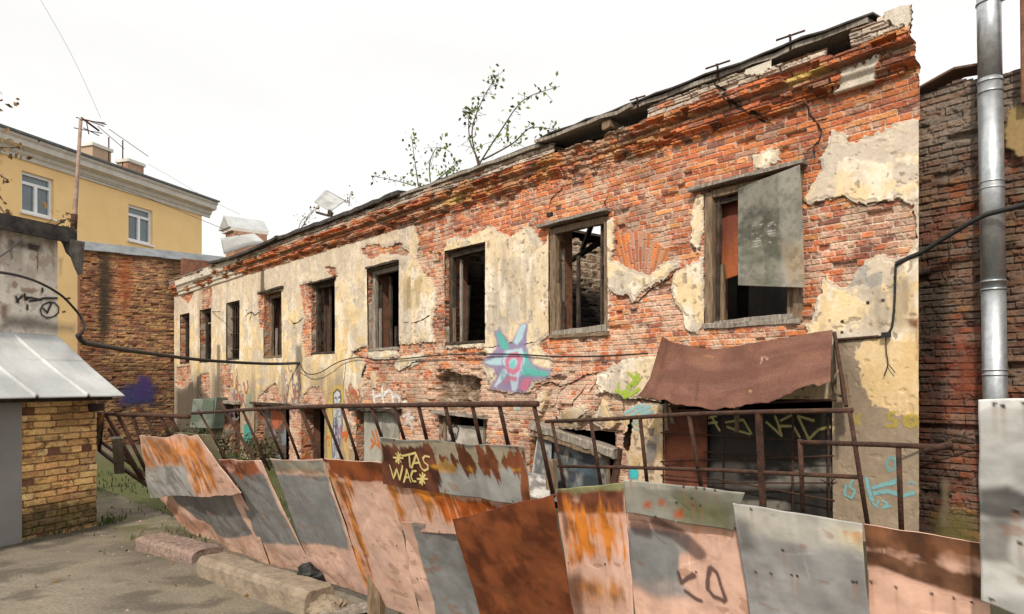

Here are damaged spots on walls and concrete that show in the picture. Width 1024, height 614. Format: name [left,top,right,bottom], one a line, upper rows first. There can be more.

crack [712,80,772,124]
crack [803,96,828,162]
spalling [257,289,265,330]
spalling [299,281,313,358]
spalling [344,70,920,483]
rust [140,434,264,497]
rust [278,441,633,614]